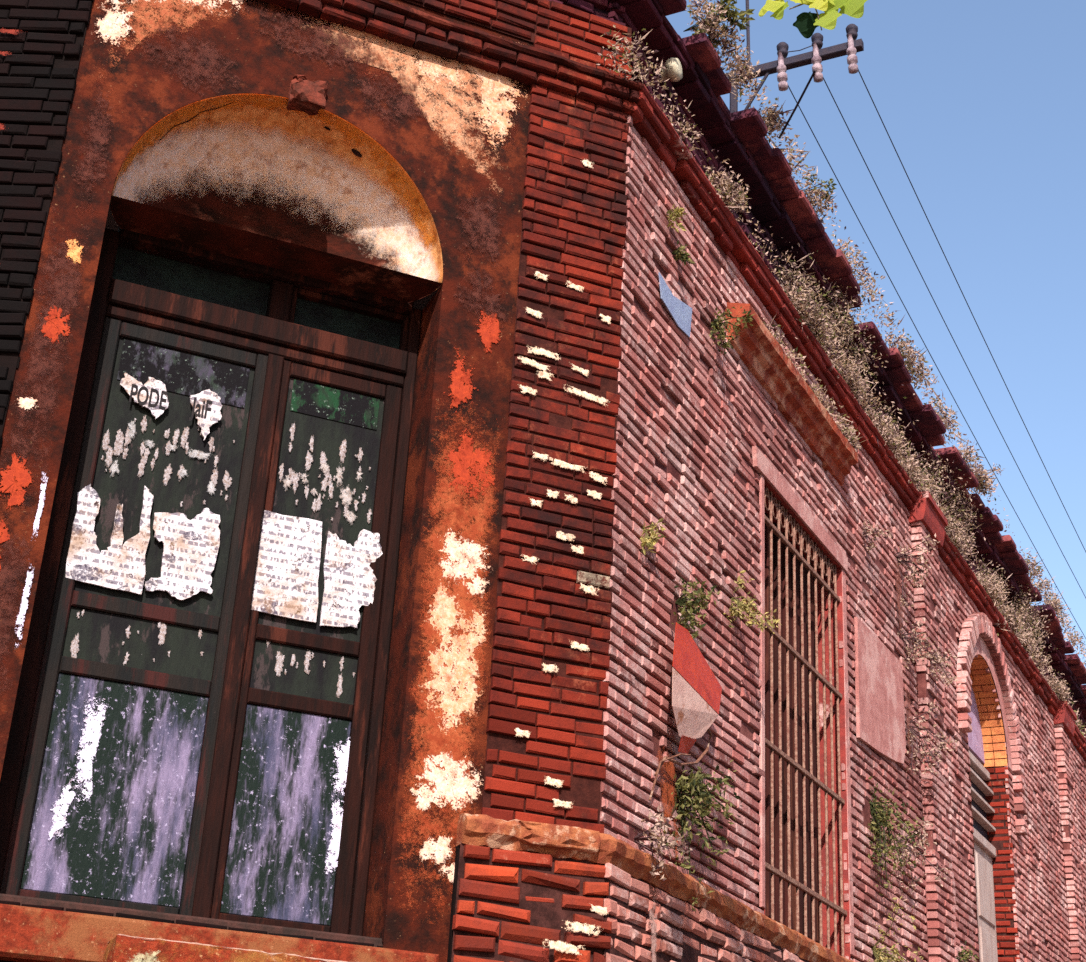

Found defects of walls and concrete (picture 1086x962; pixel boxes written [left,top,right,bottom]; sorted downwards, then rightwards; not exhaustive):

water stain [148,26,237,92]
water stain [261,12,427,120]
peeling [65,239,84,263]
peeling [40,306,71,344]
peeling [475,310,502,353]
peeling [0,453,48,543]
peeling [15,564,34,646]
peeling [398,348,497,924]